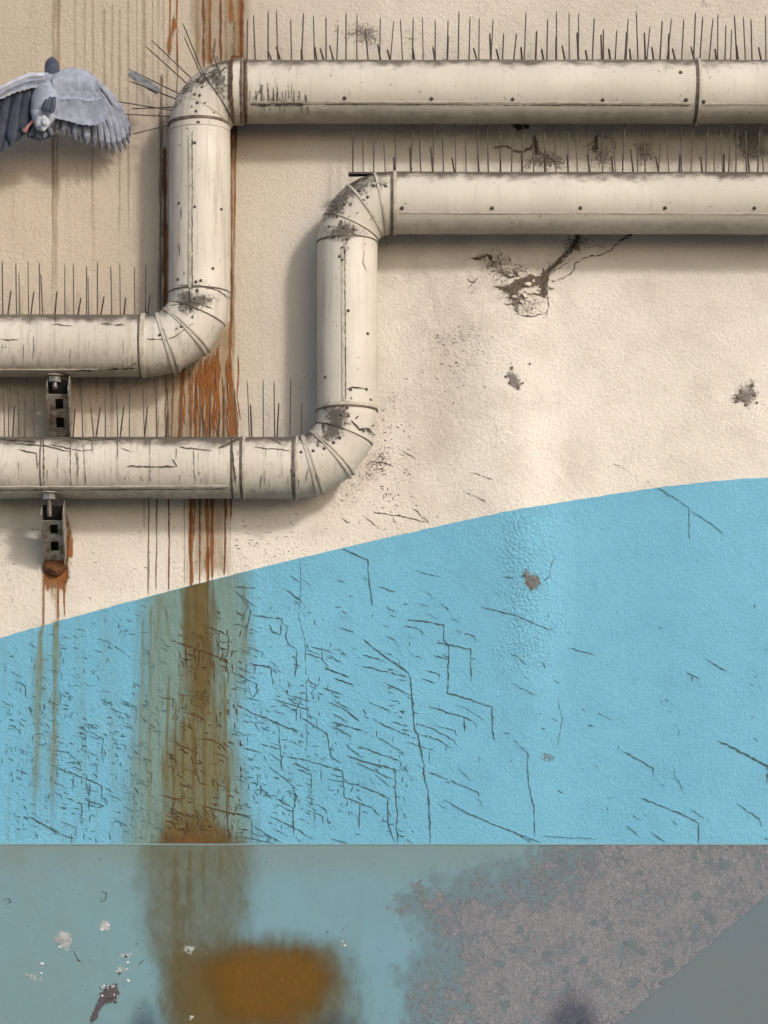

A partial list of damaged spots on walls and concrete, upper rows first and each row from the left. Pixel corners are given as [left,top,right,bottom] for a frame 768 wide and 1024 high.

rust [159,75,168,311]
rust [165,0,248,437]
flaking render [504,366,524,390]
flaking render [731,380,758,406]
rust [43,516,73,625]
crack [340,508,429,529]
rust [134,498,246,844]
crack [1,549,597,843]
crack [606,745,768,843]
crack [718,716,768,783]
spalling [90,953,132,1023]
peeling [386,845,768,1024]